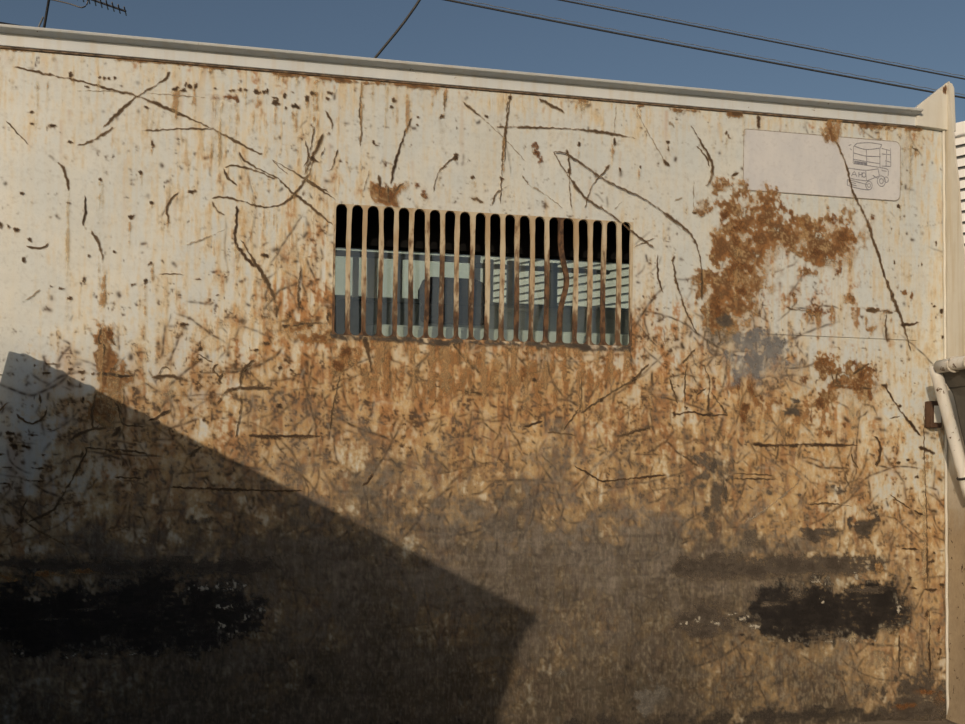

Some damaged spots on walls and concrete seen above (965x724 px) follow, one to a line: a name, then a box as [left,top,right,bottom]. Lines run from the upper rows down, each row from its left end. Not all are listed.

rust [370,175,427,207]
rust [688,177,874,335]
rust [282,309,332,344]
rust [784,292,893,341]
rust [68,323,133,429]
rust [192,346,224,383]
rust [330,340,630,413]
rust [731,351,885,439]
rust [0,431,34,455]